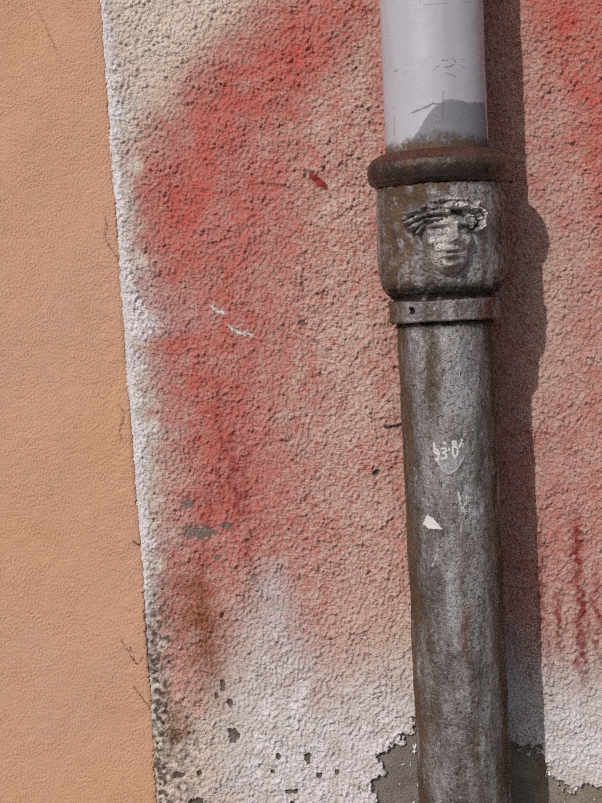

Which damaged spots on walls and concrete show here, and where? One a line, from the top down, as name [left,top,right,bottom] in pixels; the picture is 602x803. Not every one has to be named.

peeling [214,680,233,708]
peeling [227,724,240,743]
peeling [371,716,419,803]
peeling [509,739,602,803]